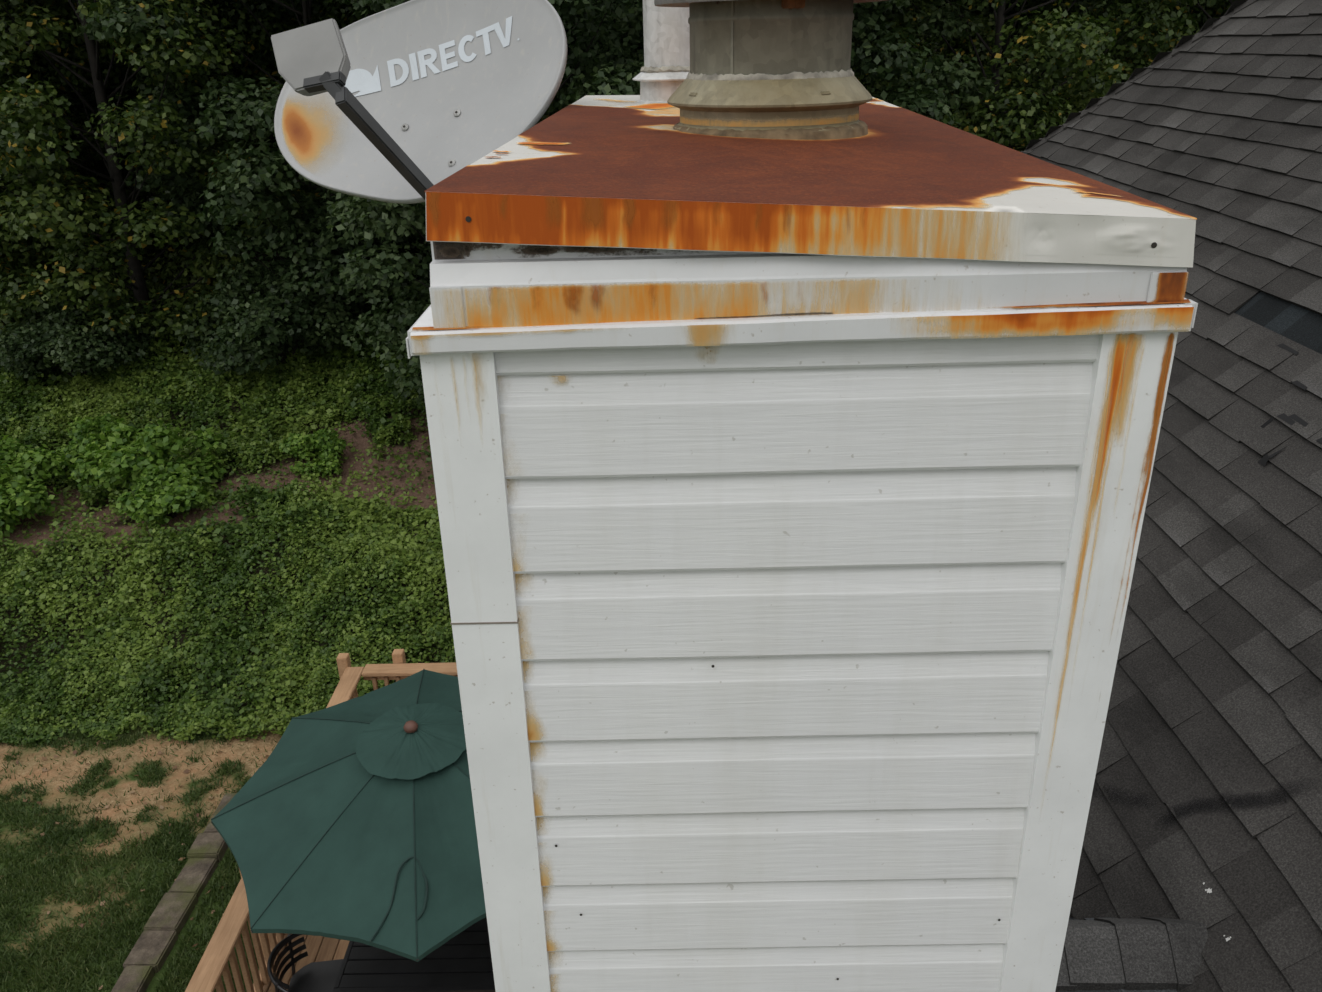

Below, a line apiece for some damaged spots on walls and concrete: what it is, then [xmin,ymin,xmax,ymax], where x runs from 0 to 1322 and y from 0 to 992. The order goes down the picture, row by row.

rust [425,98,1197,260]
rust [411,280,875,348]
rust [917,272,1194,734]